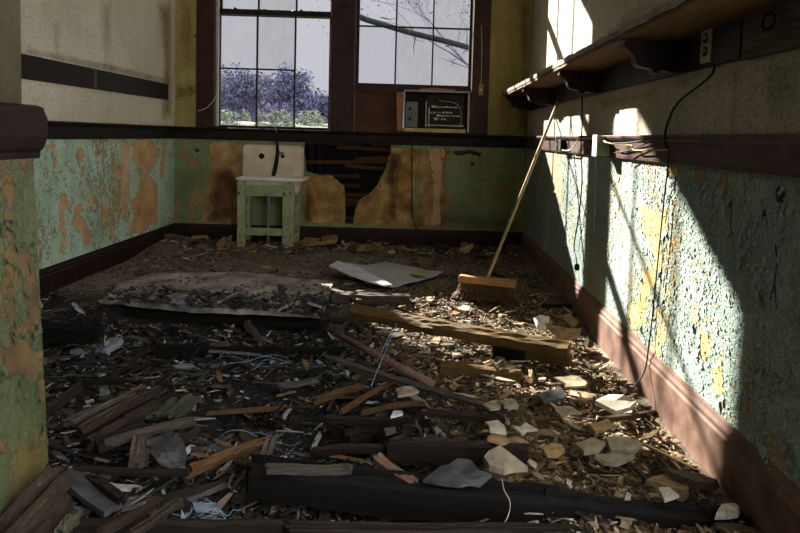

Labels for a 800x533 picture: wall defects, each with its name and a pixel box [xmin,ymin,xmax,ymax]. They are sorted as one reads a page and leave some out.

peeling [201,141,243,224]
water stain [211,172,235,218]
spalling [302,176,345,225]
spalling [355,147,452,230]
peeling [0,139,168,474]
peeling [527,149,800,488]